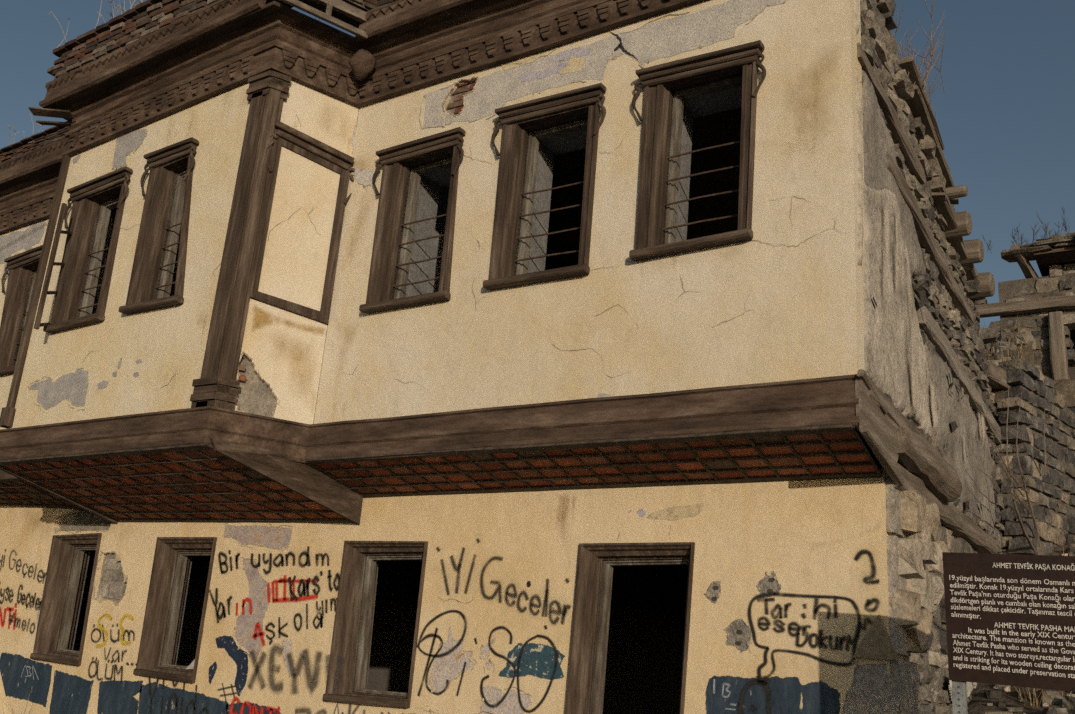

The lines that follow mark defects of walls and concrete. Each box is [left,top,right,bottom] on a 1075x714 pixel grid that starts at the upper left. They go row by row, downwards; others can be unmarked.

peeling [419,0,787,130]
peeling [28,358,142,412]
spalling [236,351,278,418]
spalling [92,551,128,606]
spalling [724,619,752,653]